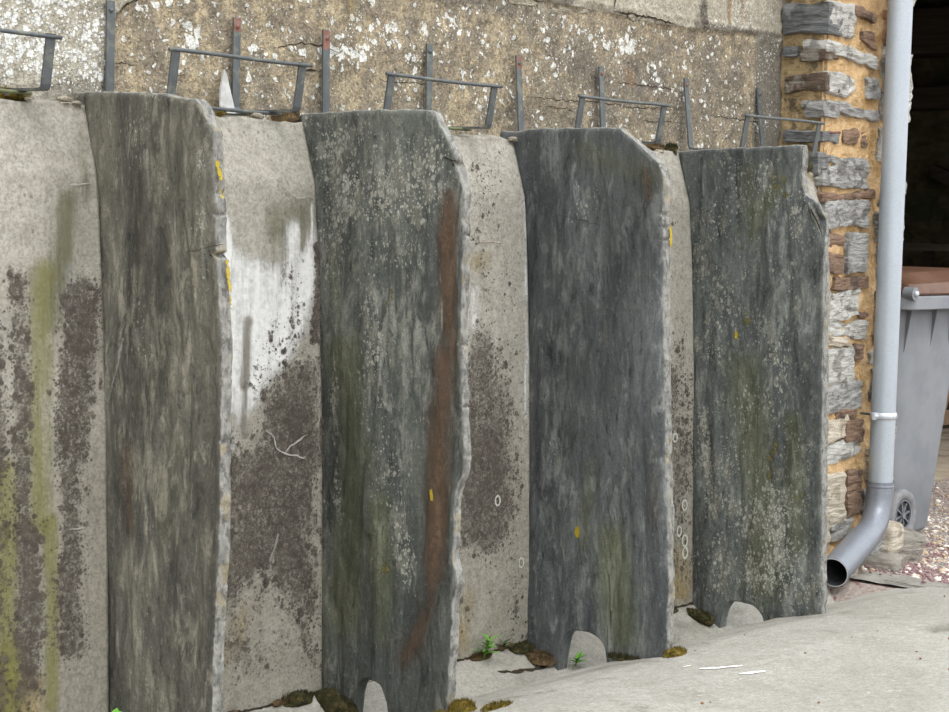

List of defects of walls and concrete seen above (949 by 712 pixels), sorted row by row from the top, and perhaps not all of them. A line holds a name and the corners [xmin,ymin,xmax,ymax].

damp [0,197,124,712]
damp [224,205,324,691]
rust [426,193,457,590]
damp [460,151,531,641]